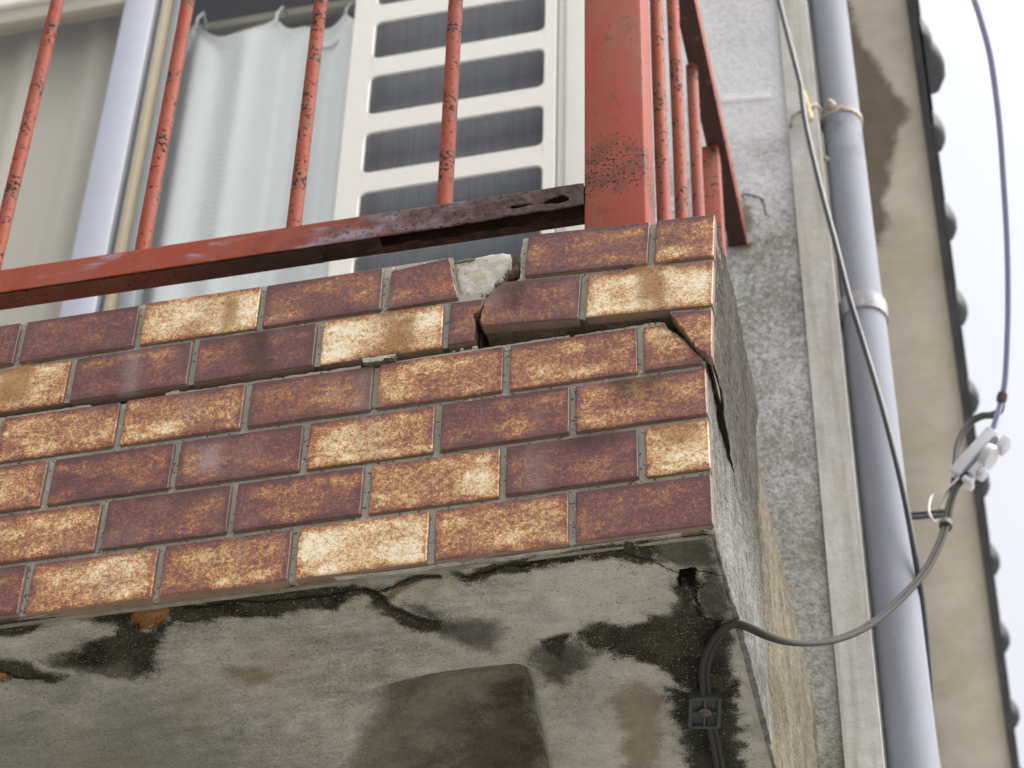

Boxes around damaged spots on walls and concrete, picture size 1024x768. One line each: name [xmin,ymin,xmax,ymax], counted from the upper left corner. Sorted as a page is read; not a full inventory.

leakage [847,2,909,244]
spalling [454,254,521,297]
rust [641,267,662,301]
crack [362,354,399,368]
crack [452,323,605,353]
crack [707,364,735,484]
crack [175,556,568,623]
crack [604,550,722,625]
leakage [0,530,751,768]